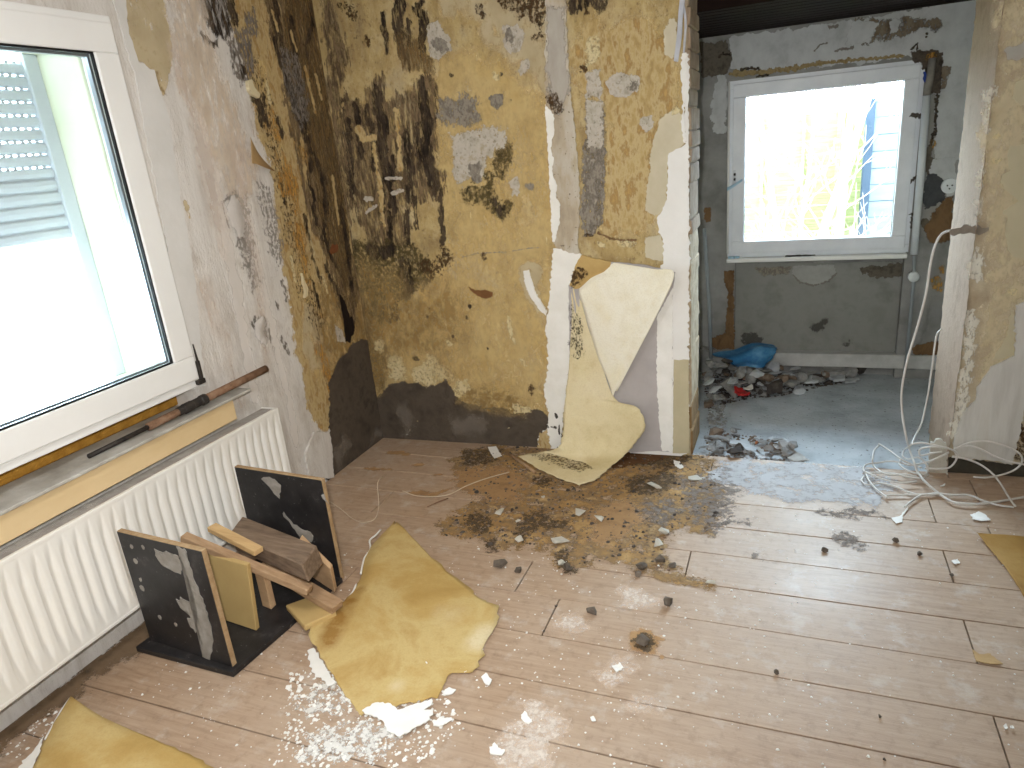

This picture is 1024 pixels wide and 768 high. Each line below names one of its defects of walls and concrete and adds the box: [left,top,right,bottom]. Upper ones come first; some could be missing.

peeling [126,0,173,95]
leakage [170,0,591,476]
spalling [448,124,509,187]
spalling [488,94,503,110]
peeling [579,16,951,456]
spalling [928,0,1024,467]